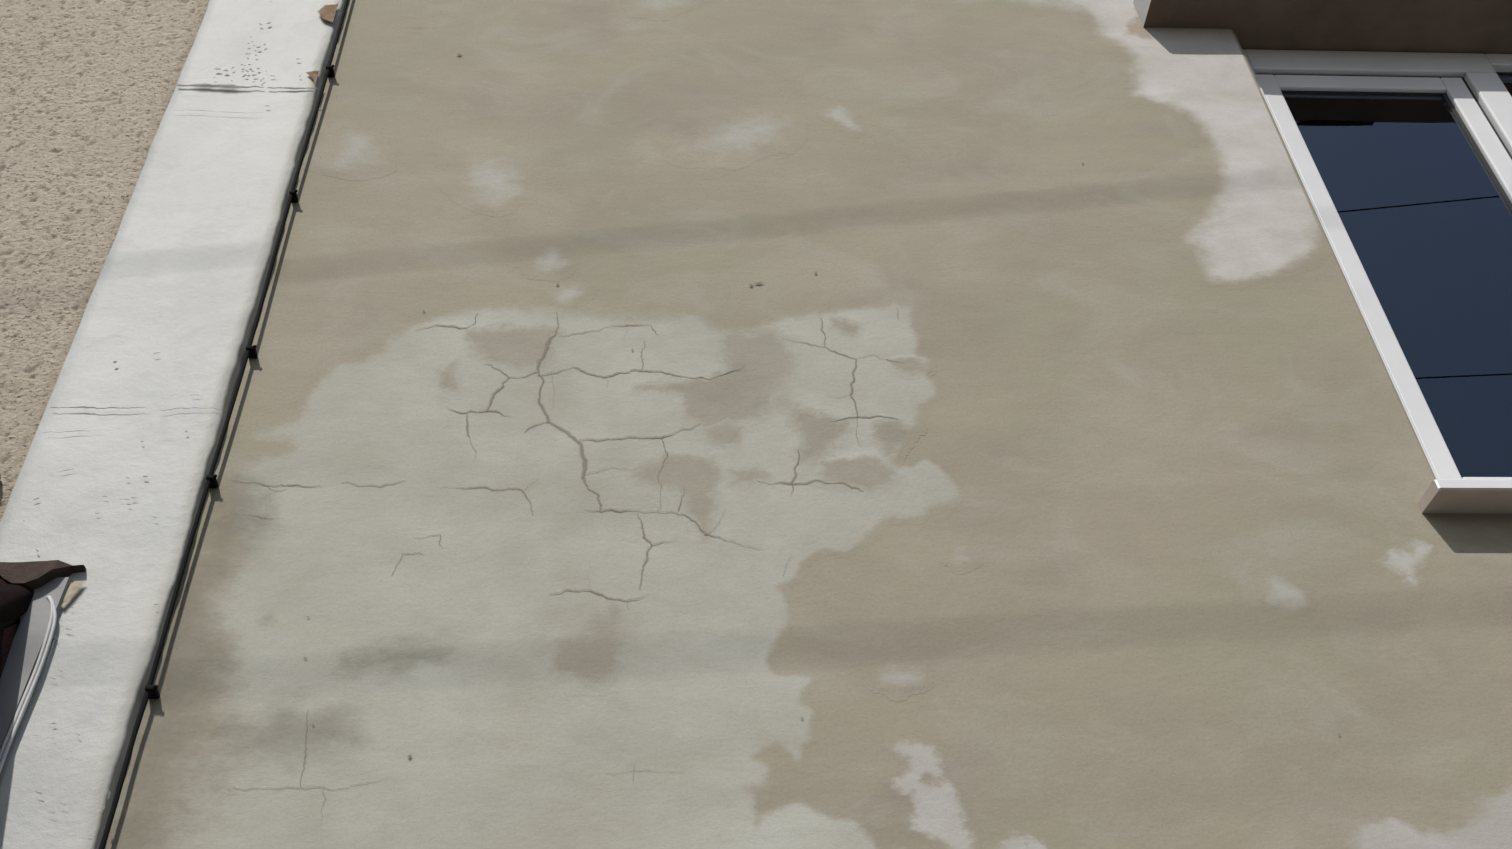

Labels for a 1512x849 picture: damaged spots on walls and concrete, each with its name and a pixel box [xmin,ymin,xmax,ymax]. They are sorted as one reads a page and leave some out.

water stain [319,127,398,181]
water stain [440,148,539,217]
water stain [655,99,869,171]
water stain [995,0,1333,289]
crack [787,318,904,439]
crack [231,479,403,518]
crack [445,313,791,607]
crack [757,451,863,493]
water stain [106,242,967,849]
water stain [1255,569,1318,618]
water stain [1331,770,1512,849]